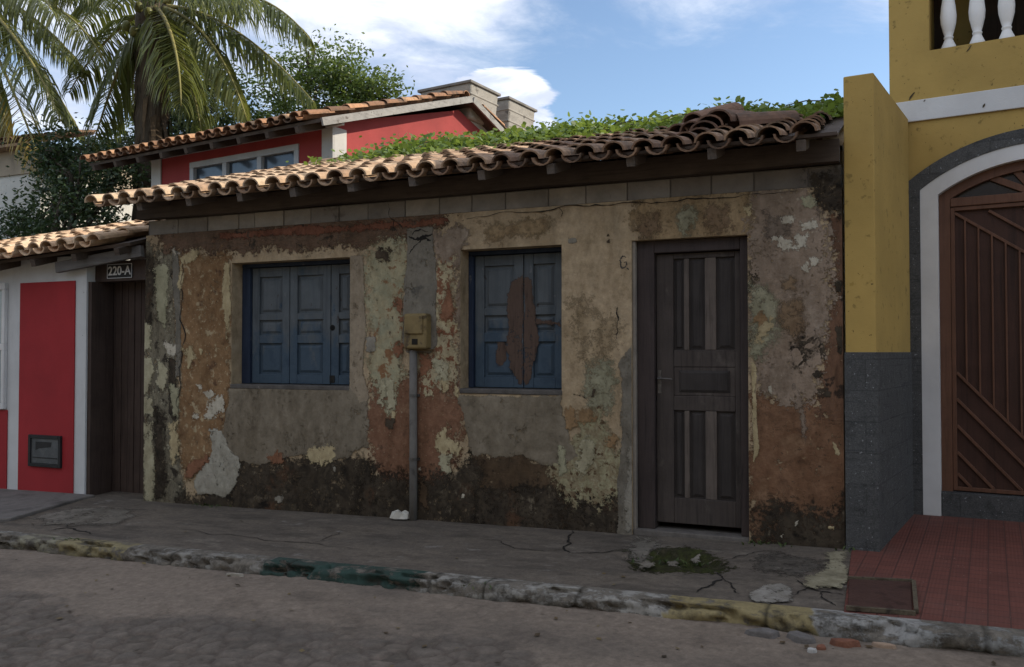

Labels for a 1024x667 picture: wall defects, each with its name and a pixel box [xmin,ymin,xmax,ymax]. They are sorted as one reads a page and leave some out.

peeling [154,213,466,487]
water stain [143,239,632,534]
crack [388,204,432,254]
peeling [496,276,625,514]
flaking render [740,188,844,425]
water stain [790,328,822,374]
water stain [749,490,845,549]